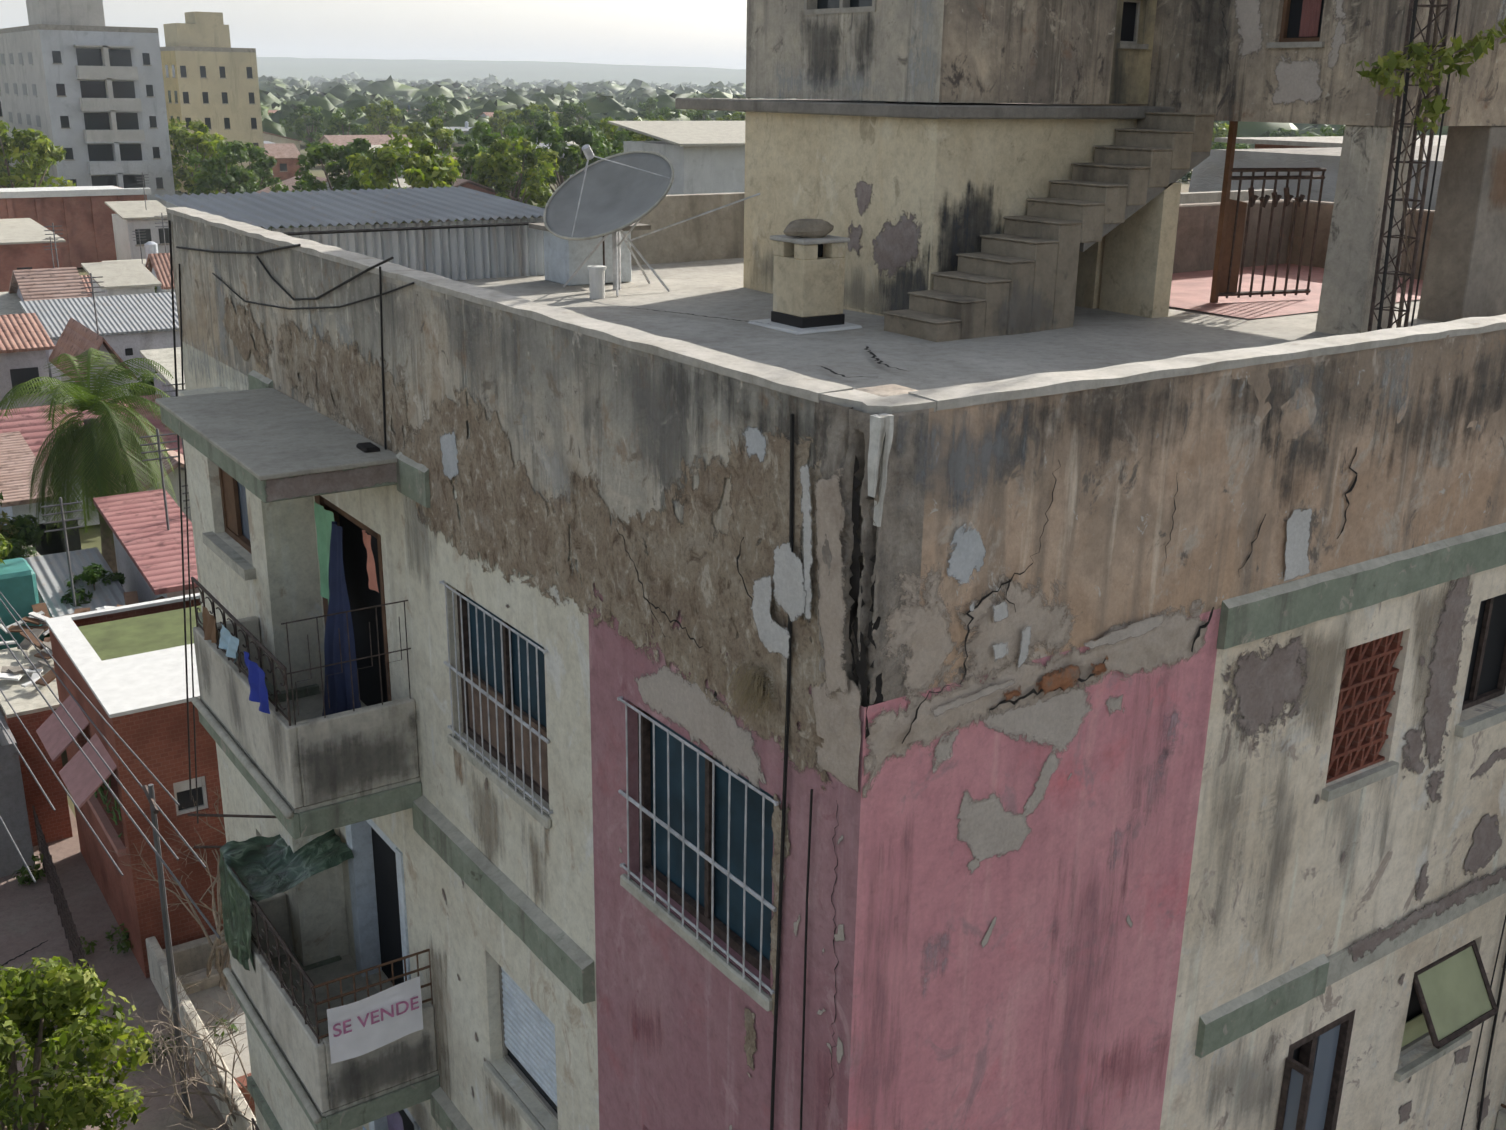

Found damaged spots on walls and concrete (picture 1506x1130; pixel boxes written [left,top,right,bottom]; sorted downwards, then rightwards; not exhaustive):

damp [779,15,872,96]
peeling [848,181,923,278]
damp [897,385,1185,510]
damp [1230,368,1349,498]
flaking render [1284,508,1312,581]
crack [1337,447,1357,539]
damp [1383,354,1506,445]
flaking render [222,295,1208,1078]
peeling [1222,636,1310,750]
peeling [1402,576,1472,810]
peeling [1348,813,1506,962]